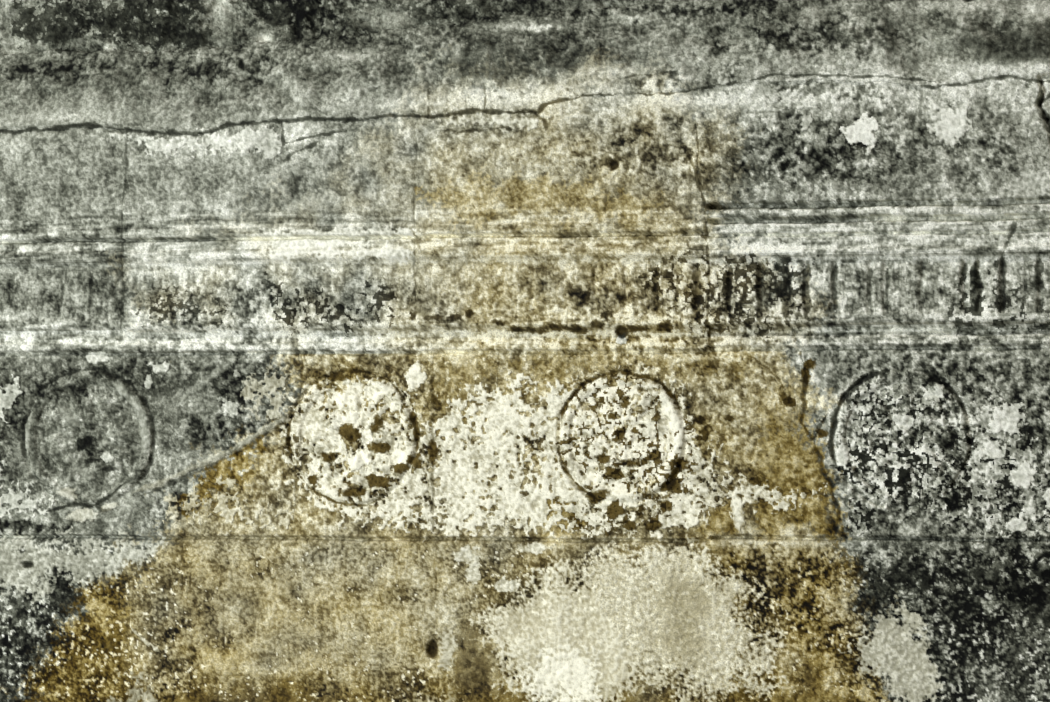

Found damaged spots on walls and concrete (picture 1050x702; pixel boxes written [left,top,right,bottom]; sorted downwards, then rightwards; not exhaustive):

crack [0,70,1050,379]
damp [491,309,614,335]
damp [830,263,839,312]
damp [944,257,1050,347]
damp [285,399,302,462]
crack [297,355,305,399]
damp [306,367,440,508]
crack [678,366,690,407]
damp [799,358,817,386]
damp [0,273,272,702]
damp [395,365,1050,702]
damp [106,546,375,702]